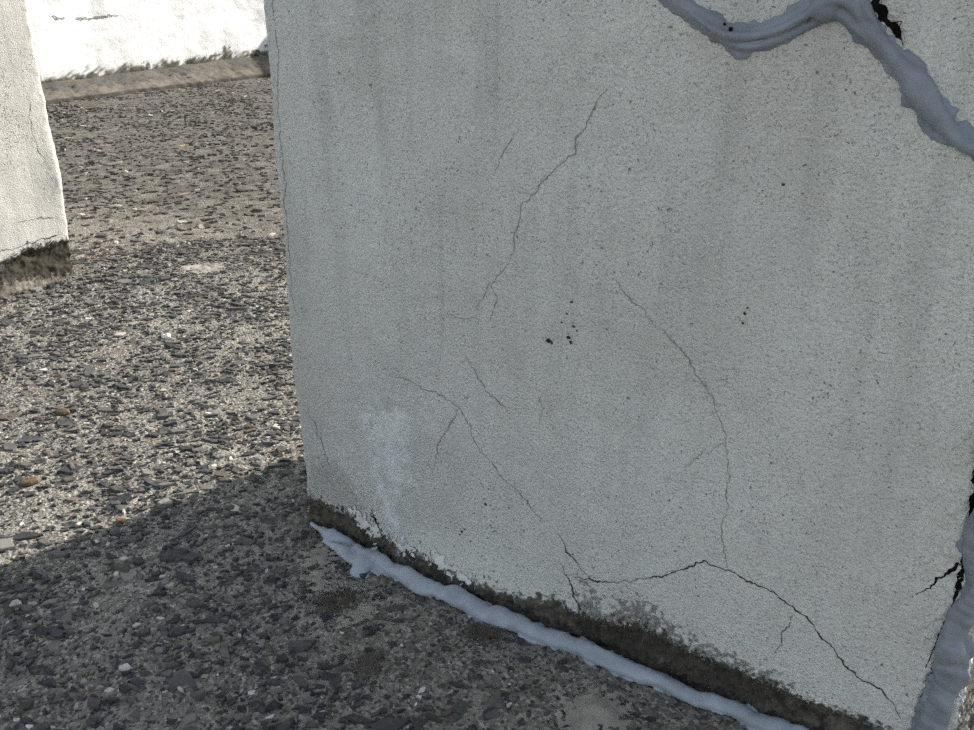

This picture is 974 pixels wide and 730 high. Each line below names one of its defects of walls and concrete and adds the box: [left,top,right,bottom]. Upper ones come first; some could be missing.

crack [49,12,119,20]
crack [871,0,903,45]
crack [447,89,607,321]
crack [1,217,63,251]
crack [388,375,538,516]
crack [560,281,900,717]
crack [966,469,974,517]
water stain [308,585,369,617]
water stain [455,619,508,649]
crack [916,558,965,670]